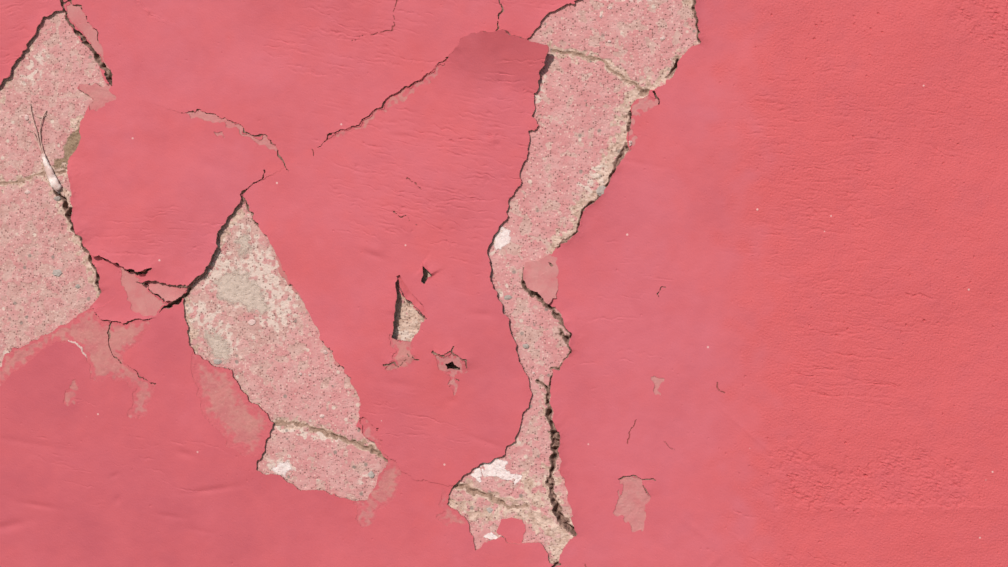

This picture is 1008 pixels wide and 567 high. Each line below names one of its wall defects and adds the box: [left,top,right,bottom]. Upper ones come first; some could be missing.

spalling [0,11,156,419]
crack [61,0,112,85]
spalling [184,201,402,527]
crack [312,57,448,156]
peeling [383,275,429,371]
peeling [432,346,468,395]
crack [453,267,577,536]
spalling [448,0,700,564]
crack [550,48,680,267]
crack [691,0,701,43]